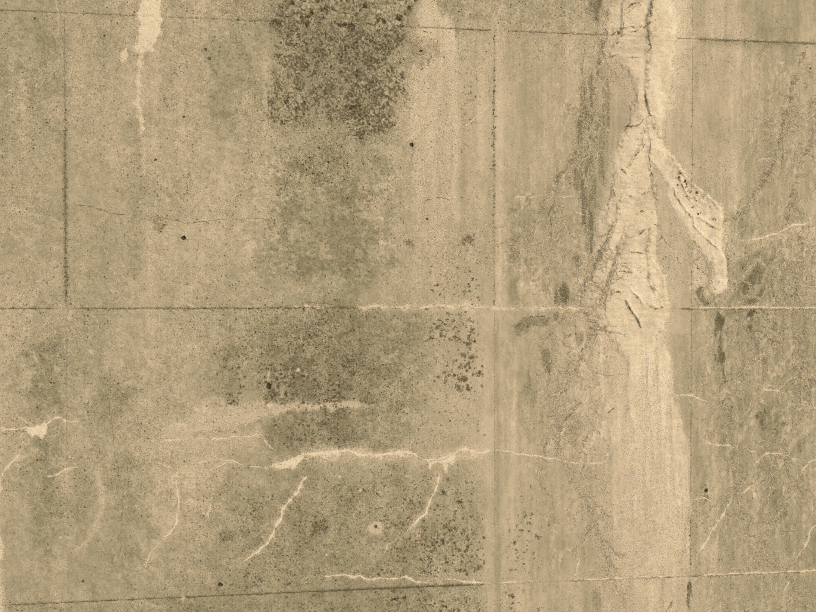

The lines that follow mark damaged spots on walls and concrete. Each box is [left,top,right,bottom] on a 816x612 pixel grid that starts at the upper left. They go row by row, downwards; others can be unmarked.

water stain [119,0,164,174]
crack [734,220,808,244]
water stain [553,0,769,612]
crack [0,398,91,524]
crack [144,428,604,566]
crack [302,572,547,590]
crack [671,393,707,403]
crack [568,441,816,599]
crack [733,380,816,417]